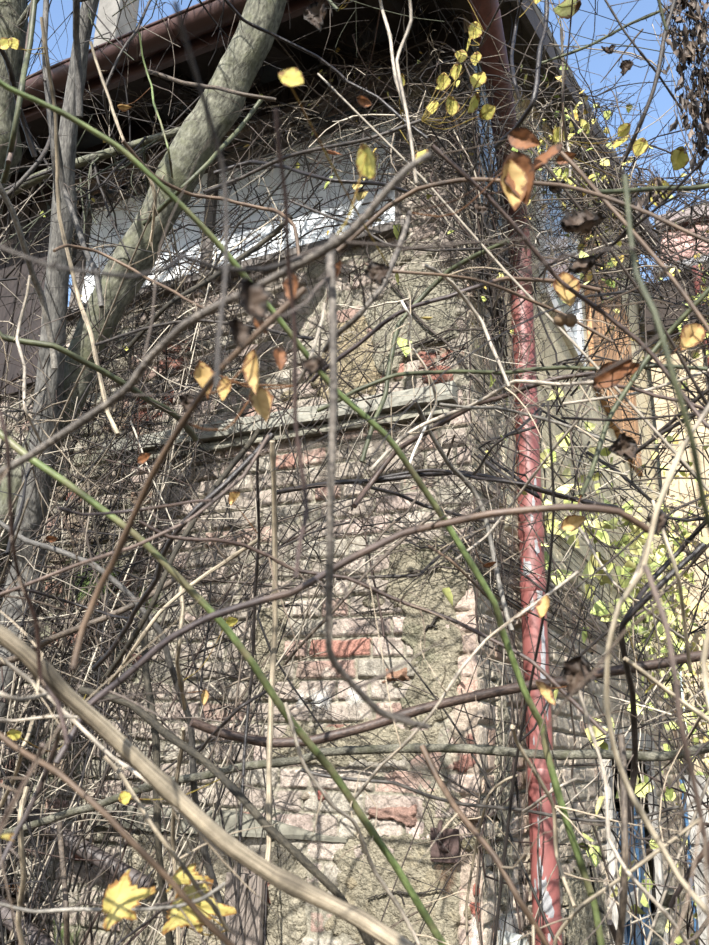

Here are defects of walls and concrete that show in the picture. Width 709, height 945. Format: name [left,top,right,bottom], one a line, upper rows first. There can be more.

flaking render [272,535,490,773]
flaking render [263,884,308,945]
flaking render [271,840,308,882]
flaking render [318,788,481,945]
flaking render [489,672,514,914]